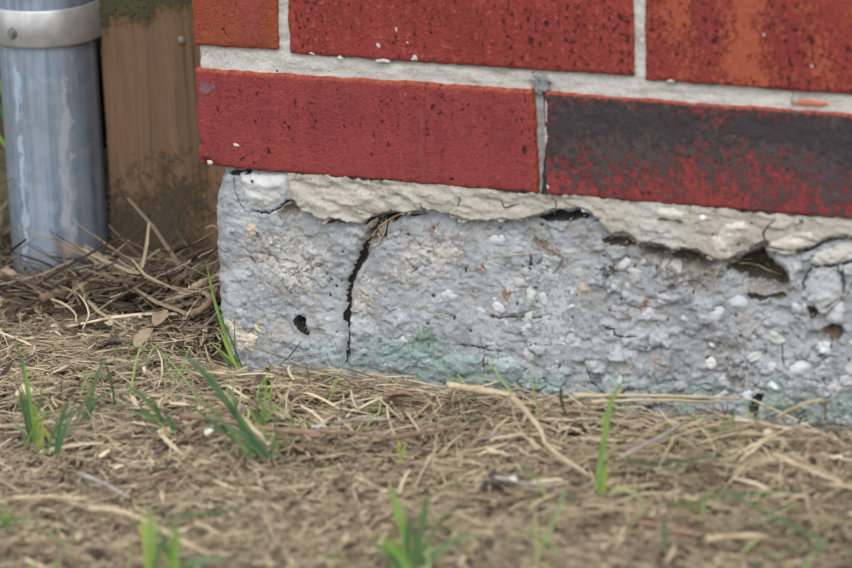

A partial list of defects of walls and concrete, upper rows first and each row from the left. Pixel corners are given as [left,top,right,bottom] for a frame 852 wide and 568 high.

spalling [539,209,592,226]
crack [343,203,427,362]
spalling [602,231,852,354]
crack [797,237,852,307]
flaking render [706,342,722,370]
flaking render [714,375,740,400]
flaking render [730,319,786,415]
flaking render [790,360,813,377]
flaking render [816,358,852,413]